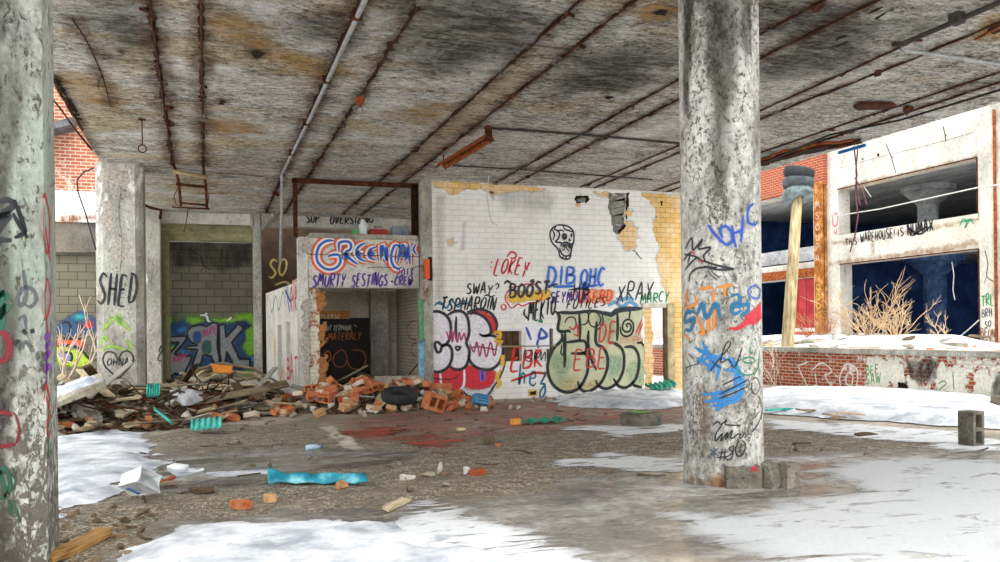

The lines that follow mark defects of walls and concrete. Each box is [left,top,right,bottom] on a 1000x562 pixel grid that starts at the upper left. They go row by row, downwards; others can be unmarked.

spalling [343,0,679,216]
spalling [759,0,894,61]
spalling [760,15,1000,120]
rust [853,102,914,115]
spalling [575,145,680,252]
flaking render [300,290,329,384]
peeling [865,356,1000,396]